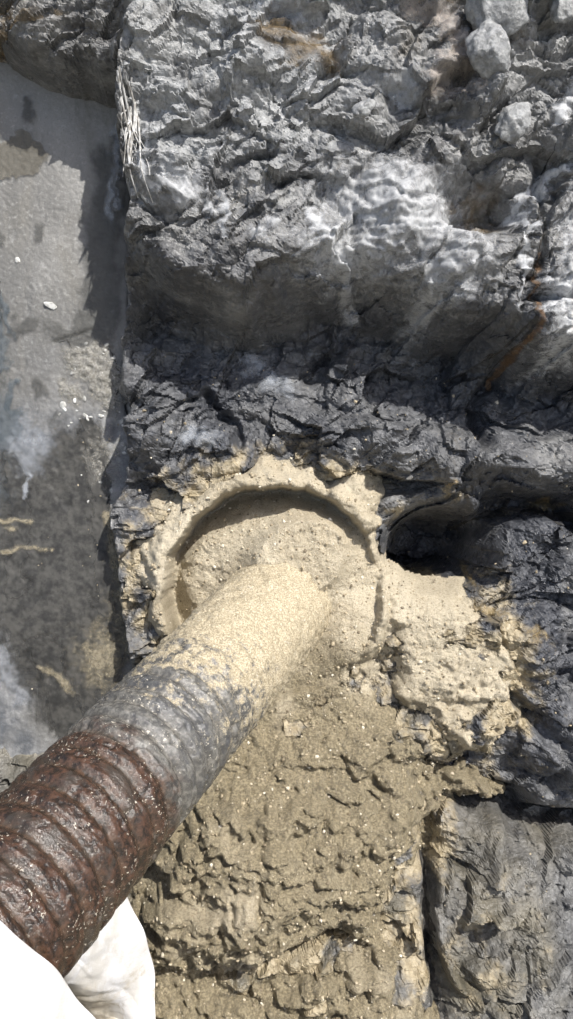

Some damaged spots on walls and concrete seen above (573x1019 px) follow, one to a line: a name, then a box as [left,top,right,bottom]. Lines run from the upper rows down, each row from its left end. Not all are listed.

water stain [0,291,37,372]
water stain [0,96,48,180]
water stain [34,223,43,241]
water stain [55,128,231,345]
water stain [0,378,128,739]
crack [419,826,449,1019]